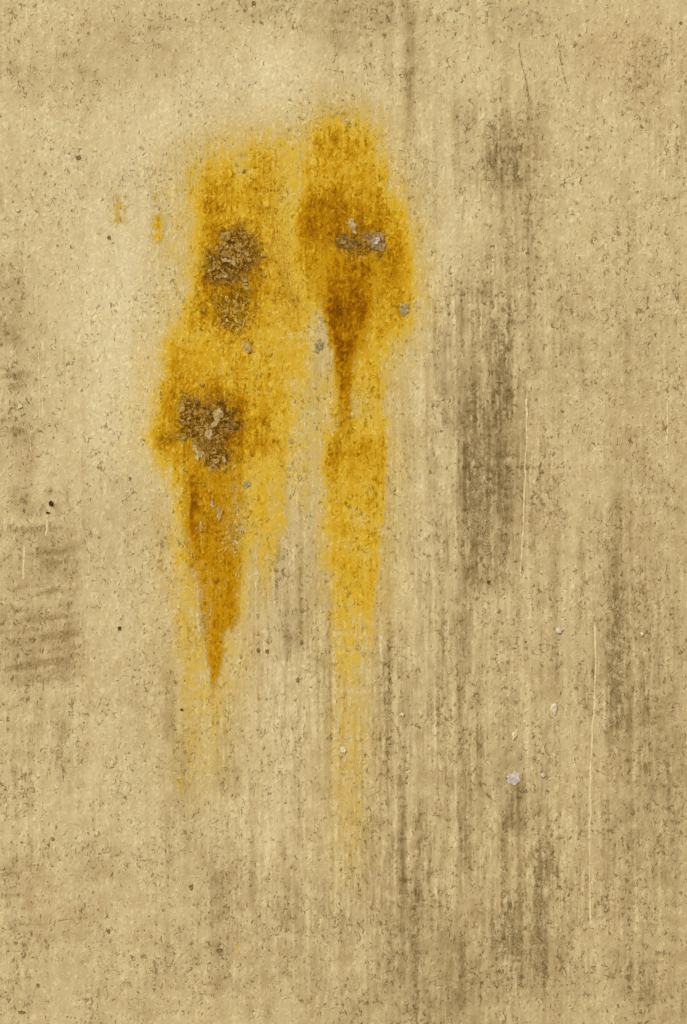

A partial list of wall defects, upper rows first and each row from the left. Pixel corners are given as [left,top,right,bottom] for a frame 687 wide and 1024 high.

rust [107,71,452,906]
water stain [431,95,548,631]